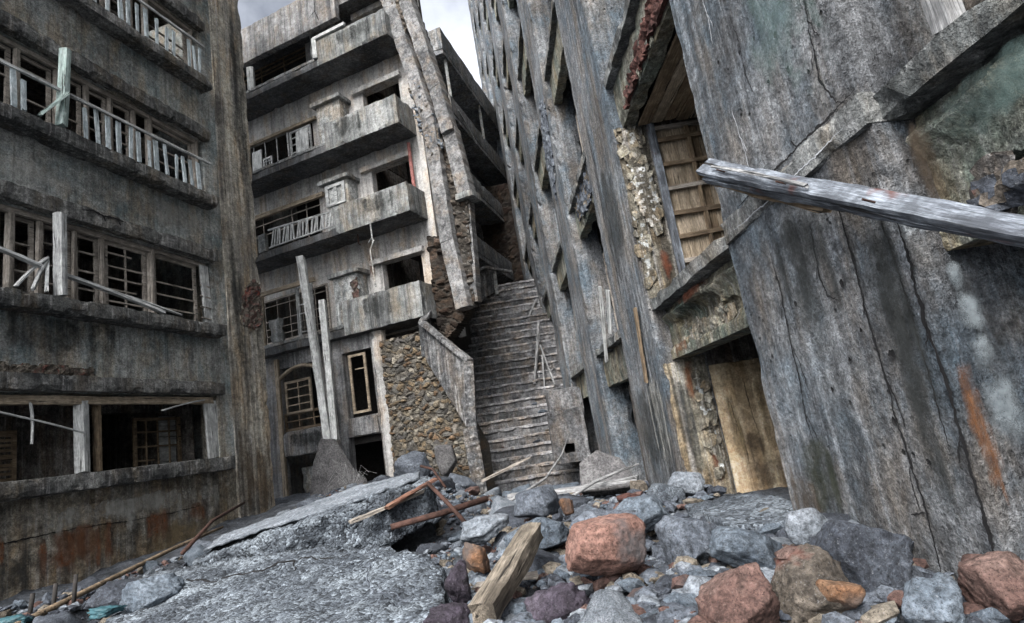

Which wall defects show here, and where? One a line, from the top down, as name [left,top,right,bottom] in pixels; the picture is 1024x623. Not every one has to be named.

spalling [623,0,668,110]
crack [732,0,855,181]
peeling [615,125,664,289]
spalling [966,150,1024,214]
spalling [239,279,263,333]
crack [839,211,941,572]
crack [881,223,994,551]